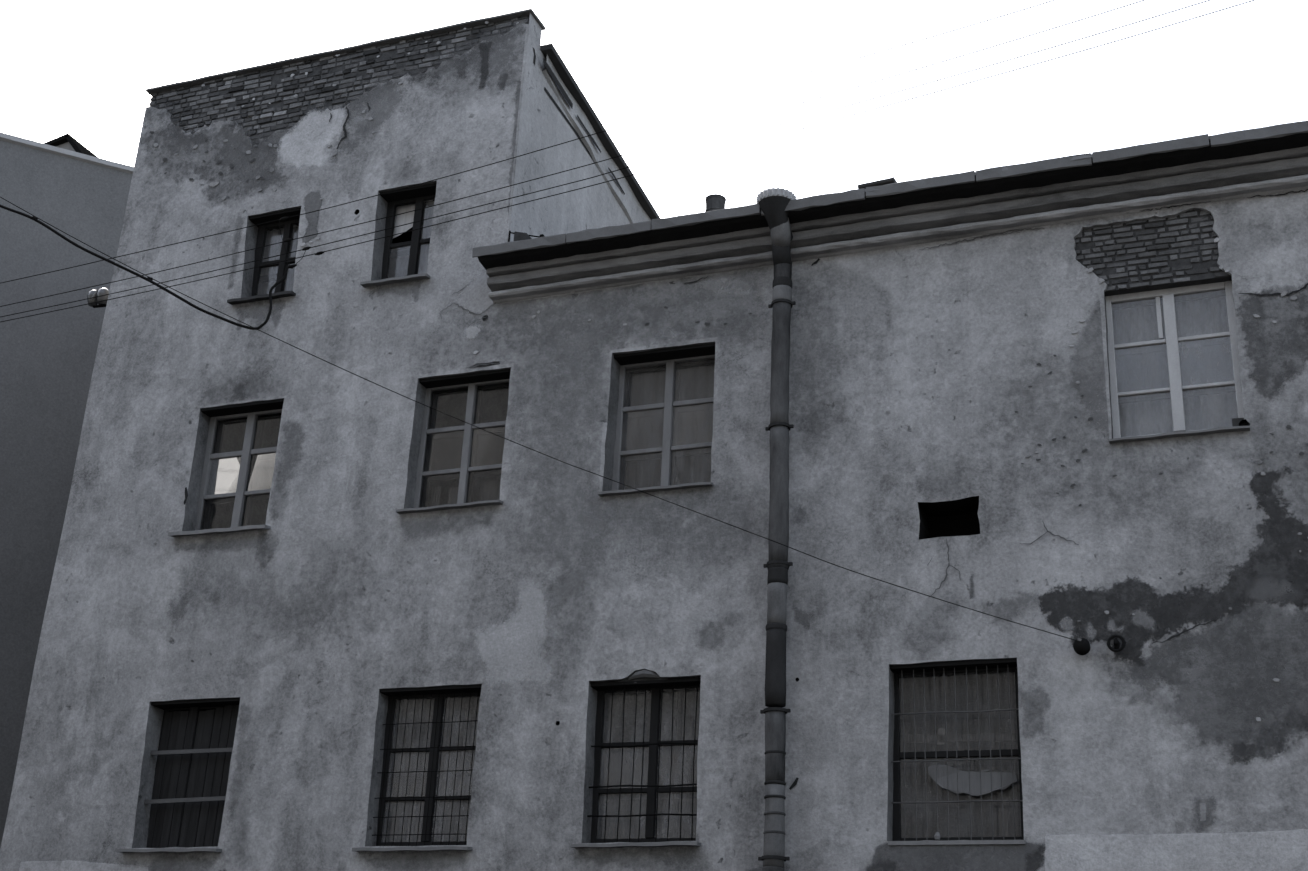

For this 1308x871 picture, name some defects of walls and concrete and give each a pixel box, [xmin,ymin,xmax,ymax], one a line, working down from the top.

flaking render [145,15,529,200]
flaking render [1070,209,1231,429]
flaking render [1236,288,1308,398]
crack [1238,283,1308,296]
flaking render [866,842,1045,871]